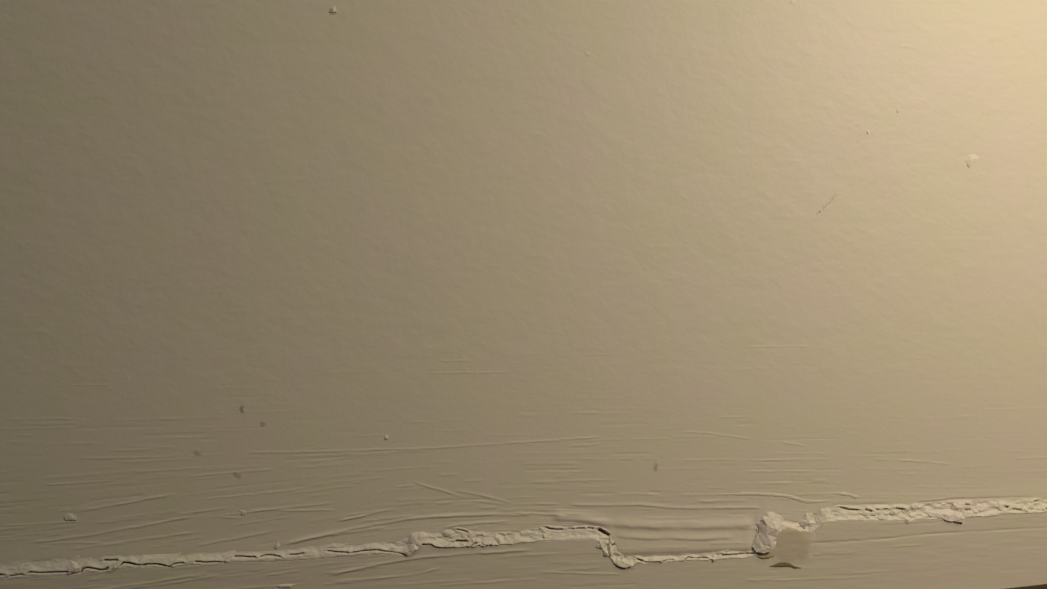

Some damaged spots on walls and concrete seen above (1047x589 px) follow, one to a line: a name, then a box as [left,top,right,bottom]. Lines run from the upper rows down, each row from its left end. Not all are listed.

peeling [433,530,520,548]
crack [0,553,303,576]
peeling [138,552,182,565]
crack [328,544,428,555]